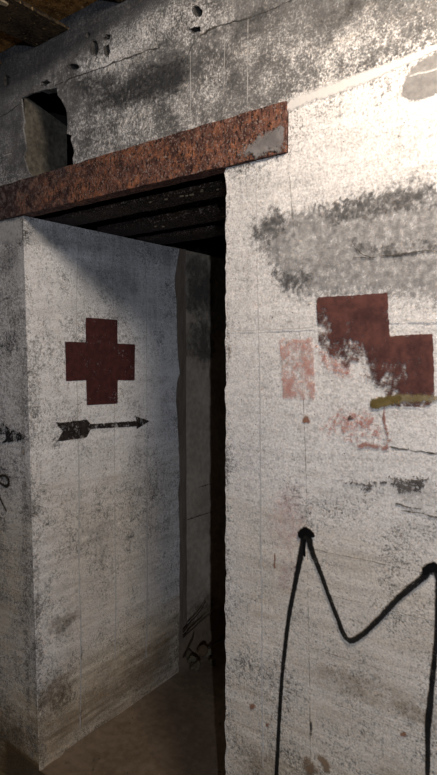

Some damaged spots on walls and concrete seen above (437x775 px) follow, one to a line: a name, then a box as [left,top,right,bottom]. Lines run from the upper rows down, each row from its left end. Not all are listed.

crack [188,0,292,56]
crack [55,47,159,86]